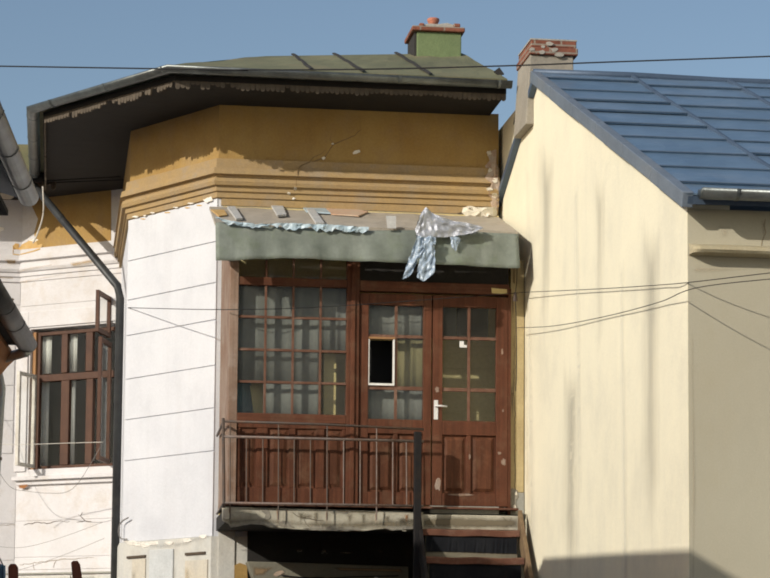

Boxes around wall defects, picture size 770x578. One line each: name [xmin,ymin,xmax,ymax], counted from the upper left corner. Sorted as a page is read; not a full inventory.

spalling [485,149,500,216]
flaking render [13,190,111,255]
spalling [231,508,368,531]